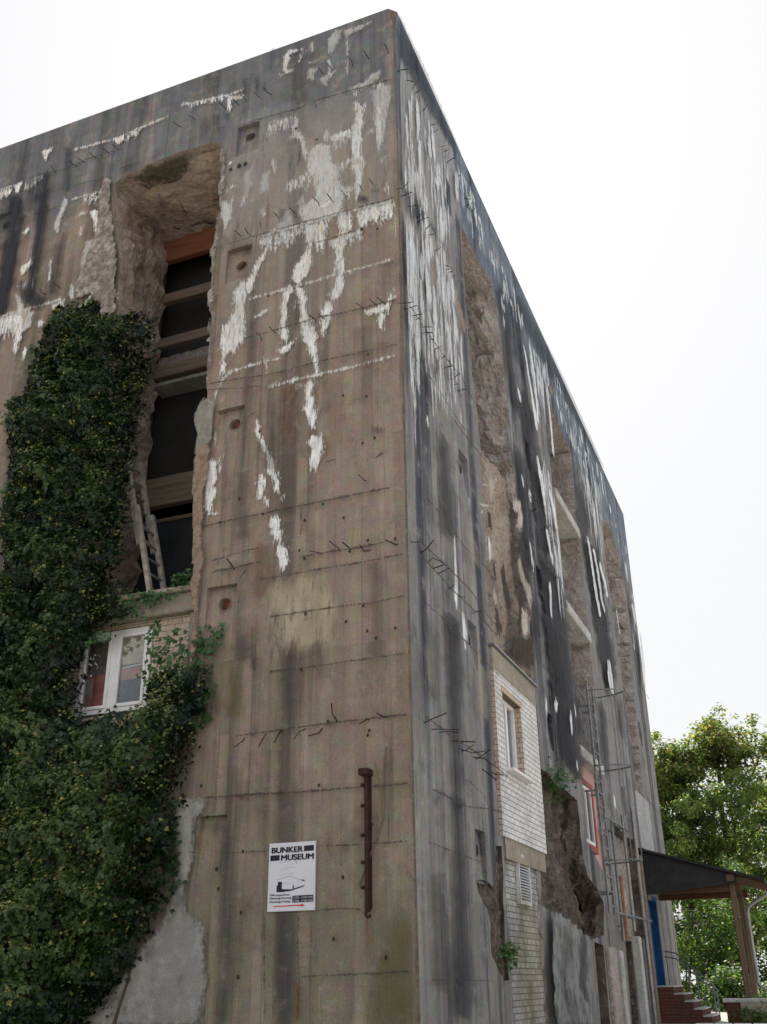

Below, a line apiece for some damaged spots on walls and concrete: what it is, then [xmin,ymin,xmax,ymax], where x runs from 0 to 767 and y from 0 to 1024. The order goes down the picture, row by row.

spalling [74,177,117,316]
spalling [201,148,247,401]
water stain [215,14,620,780]
spalling [384,9,505,1024]
water stain [440,433,472,1019]
peeling [473,450,537,675]
water stain [630,595,646,689]